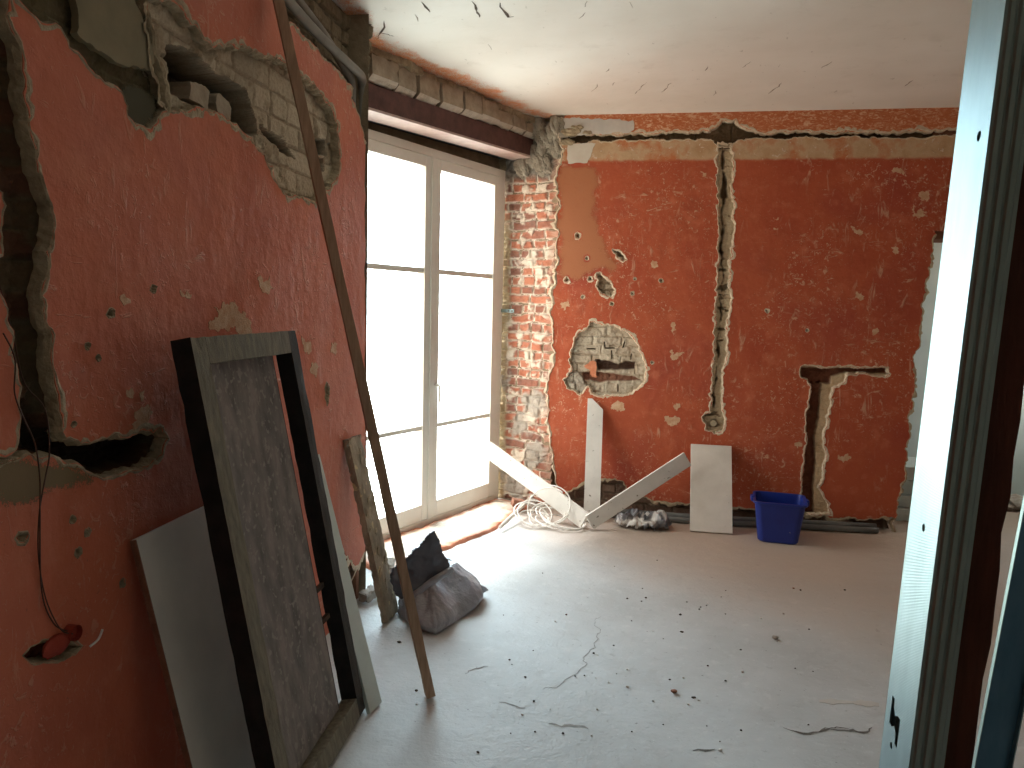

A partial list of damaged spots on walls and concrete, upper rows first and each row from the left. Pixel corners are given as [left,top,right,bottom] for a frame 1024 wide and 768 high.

spalling [0,0,342,481]
flaking render [286,0,957,529]